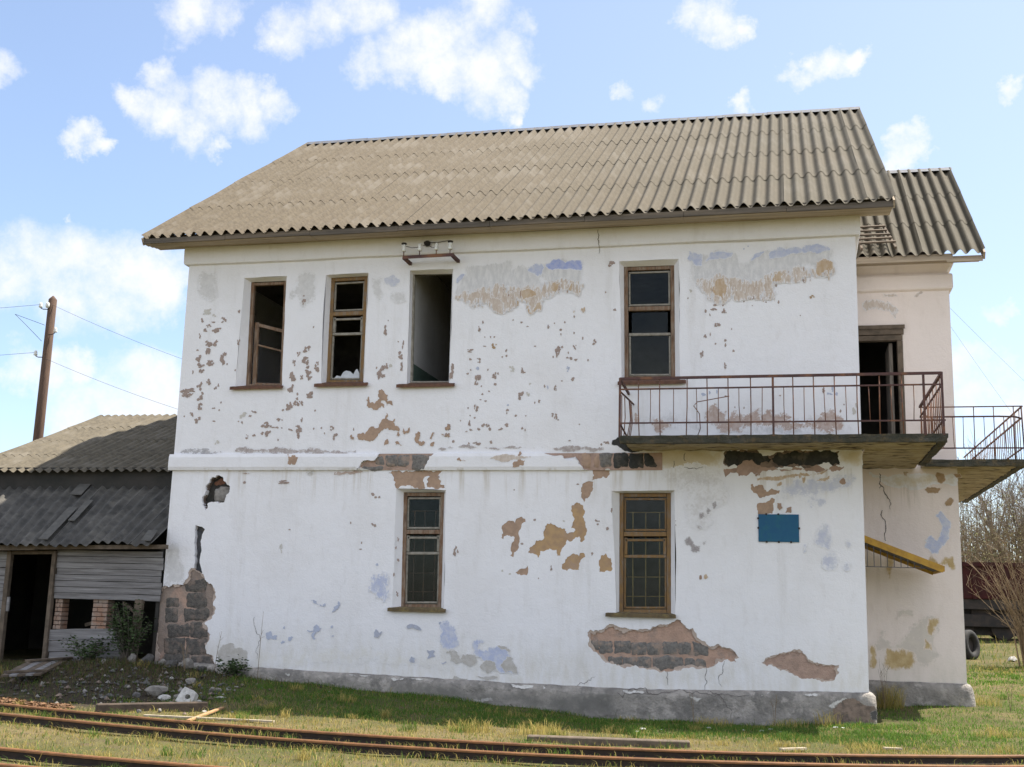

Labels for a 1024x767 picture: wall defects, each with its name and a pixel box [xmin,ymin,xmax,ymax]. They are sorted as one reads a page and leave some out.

peeling [180,309,236,423]
peeling [238,321,540,475]
peeling [454,258,596,391]
peeling [687,243,836,352]
spalling [203,475,230,509]
peeling [502,440,662,572]
peeling [724,450,844,514]
crack [879,473,891,541]
flaking render [157,526,248,666]
flaking render [591,620,736,672]
flaking render [765,651,836,680]